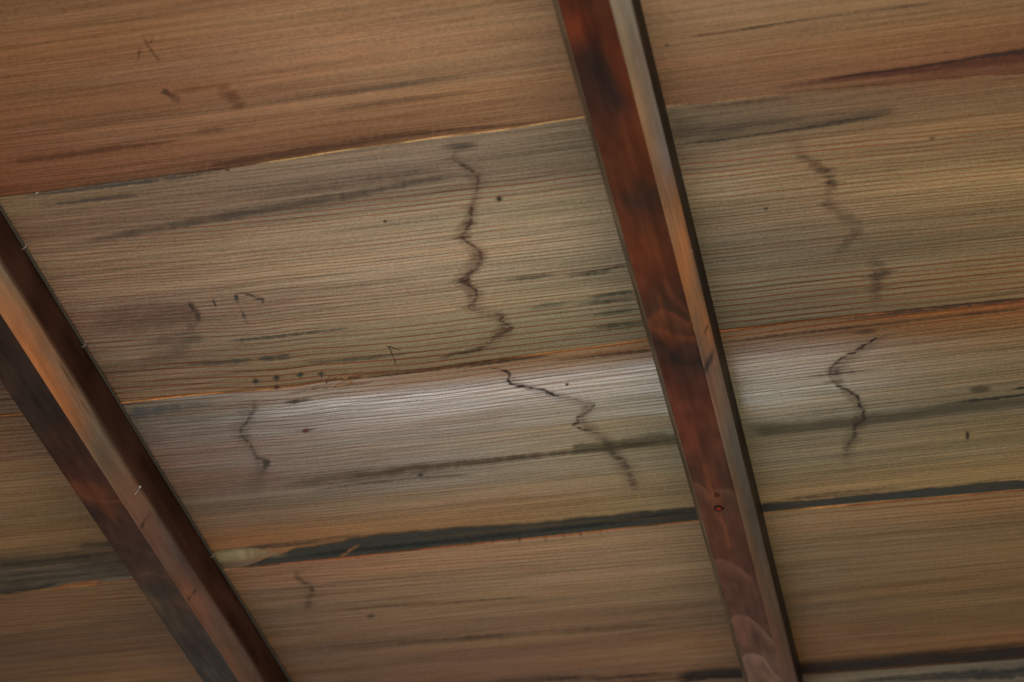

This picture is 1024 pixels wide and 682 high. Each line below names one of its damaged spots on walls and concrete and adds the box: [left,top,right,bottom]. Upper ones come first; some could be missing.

leakage [459,208,481,306]
leakage [757,299,1024,435]